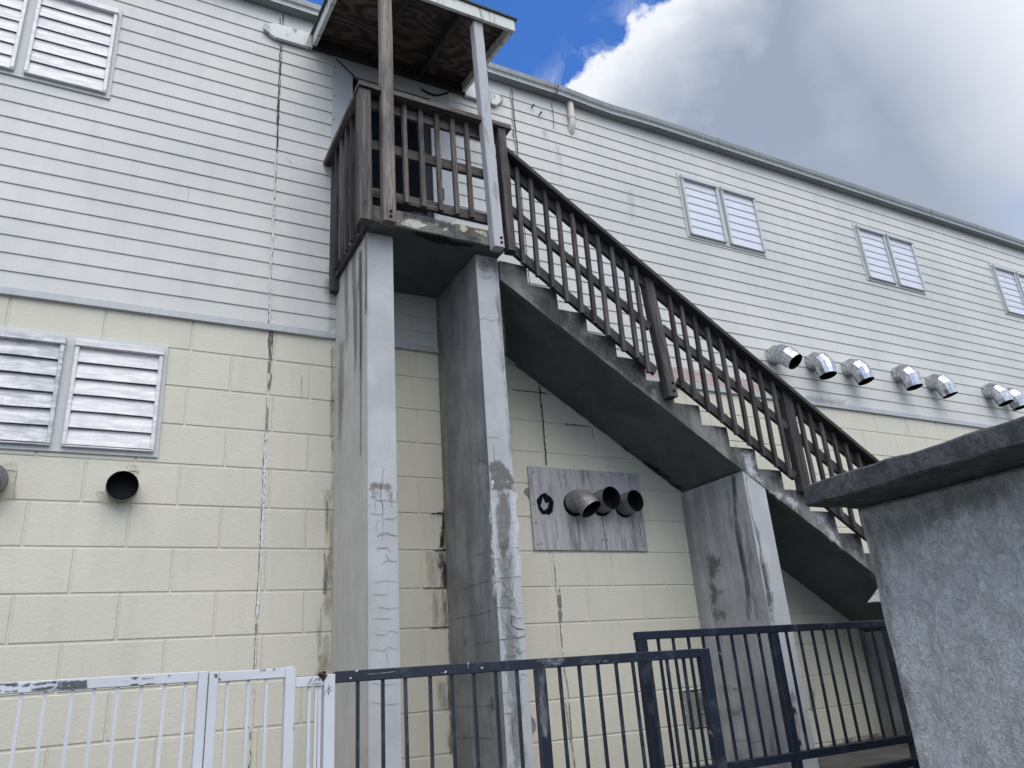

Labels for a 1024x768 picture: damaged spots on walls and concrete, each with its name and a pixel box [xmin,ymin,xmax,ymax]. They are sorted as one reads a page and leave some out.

crack [276,18,291,163]
peeling [398,219,487,237]
crack [513,385,547,465]
crack [248,442,267,768]
crack [369,471,400,705]
damp [425,512,447,589]
crack [457,522,525,749]
damp [489,461,521,576]
damp [709,556,724,617]
crack [564,668,575,765]